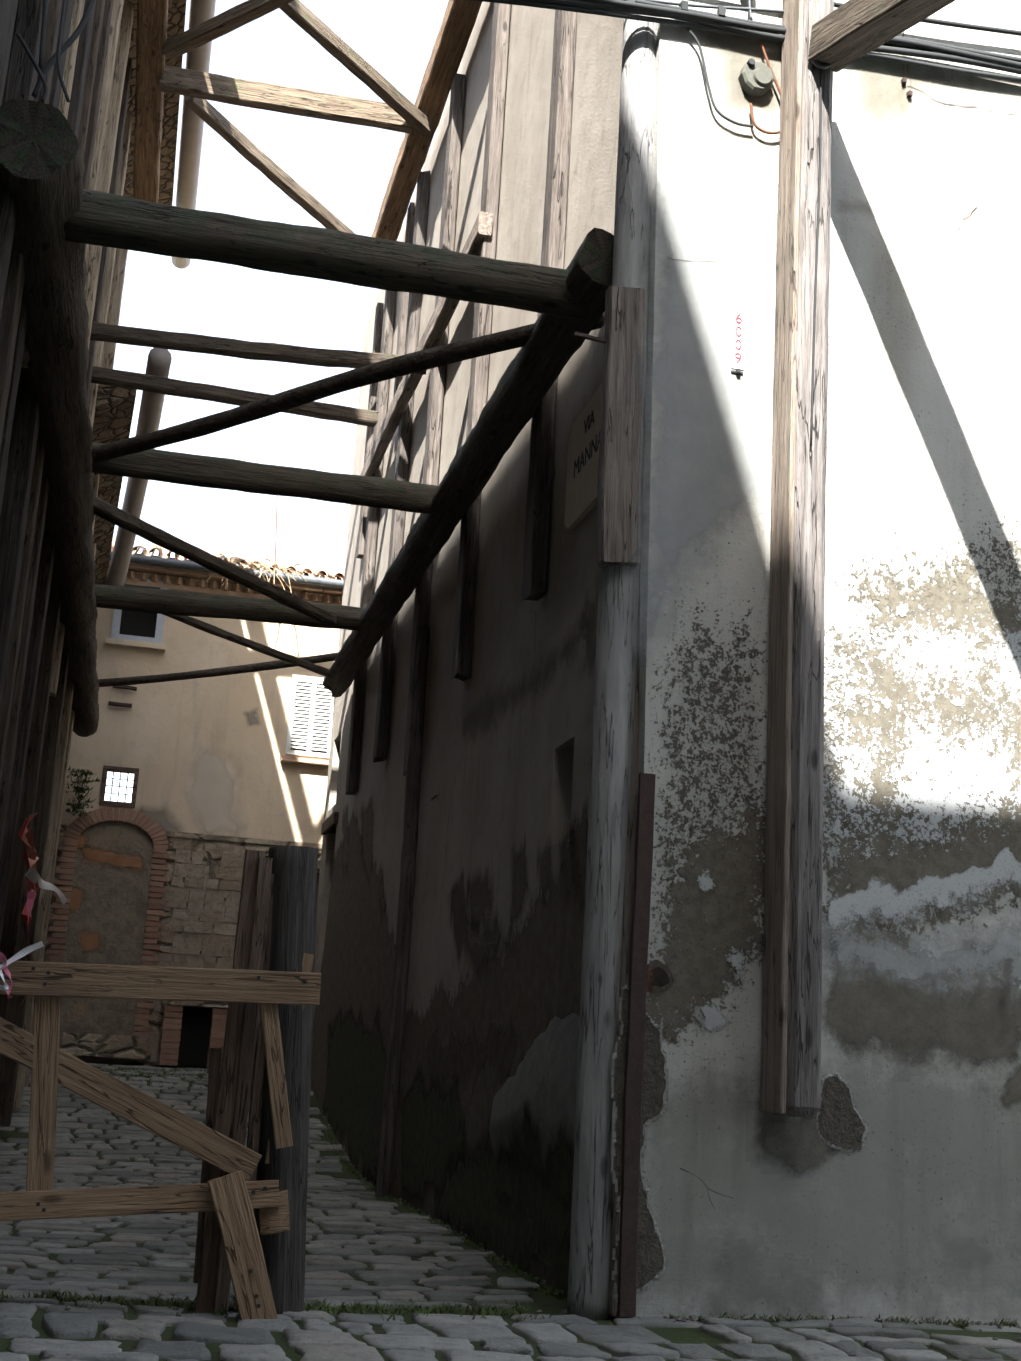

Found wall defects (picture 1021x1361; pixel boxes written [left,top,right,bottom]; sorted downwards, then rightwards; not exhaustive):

crack [903,32,1021,117]
water stain [310,797,588,1297]
flaking render [610,984,629,1311]
peeling [636,587,768,1295]
flaking render [816,1072,868,1156]
peeling [822,513,1021,956]